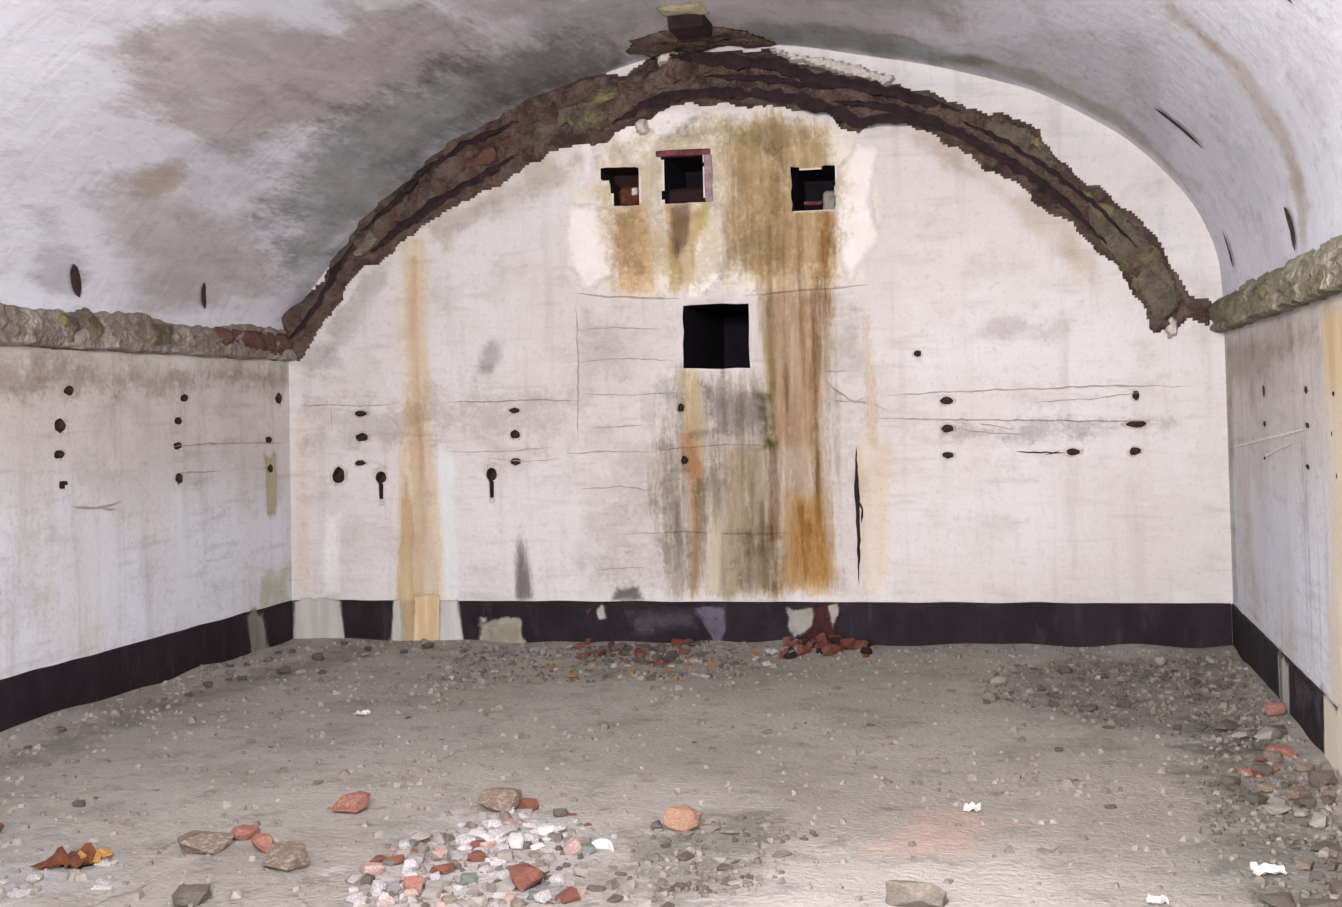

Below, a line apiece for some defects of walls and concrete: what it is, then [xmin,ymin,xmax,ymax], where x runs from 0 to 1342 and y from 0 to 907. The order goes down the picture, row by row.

spalling [0,0,1342,466]
rust [398,494,440,641]
rust [706,460,720,593]
rust [1314,292,1342,779]